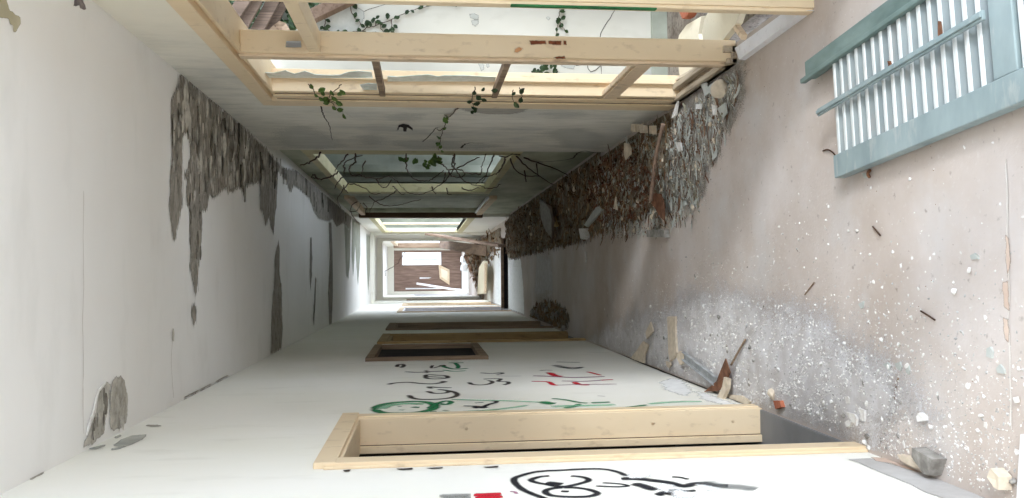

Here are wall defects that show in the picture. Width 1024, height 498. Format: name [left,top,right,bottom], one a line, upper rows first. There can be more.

peeling [0,0,21,32]
peeling [168,75,352,296]
peeling [84,376,160,450]